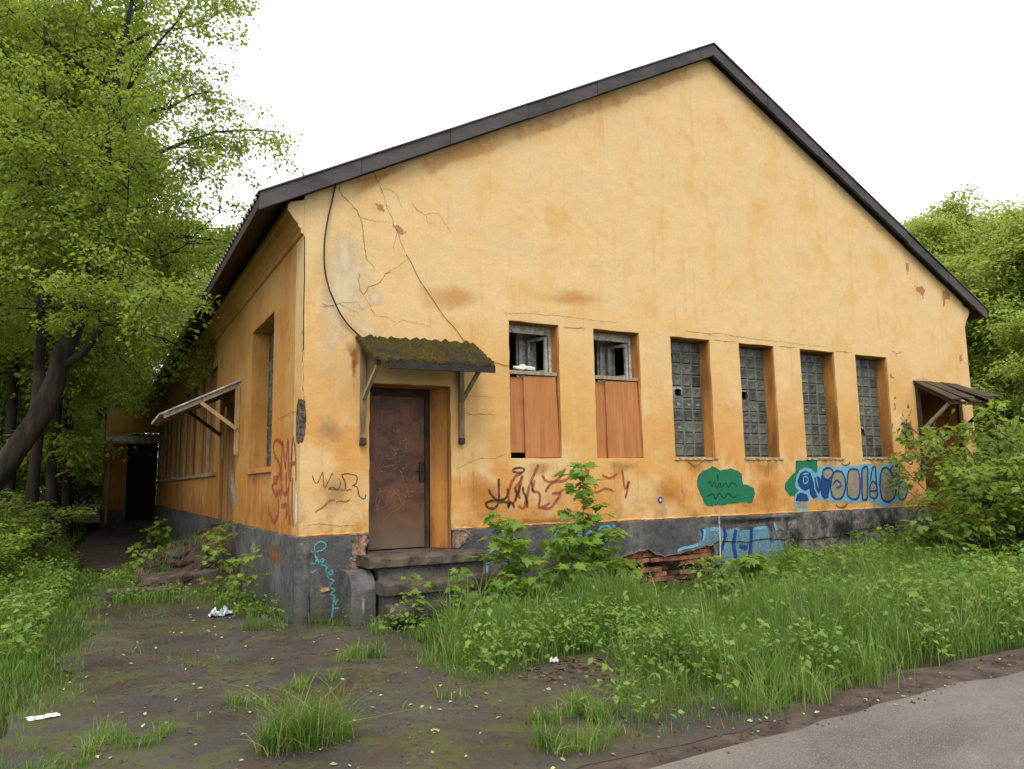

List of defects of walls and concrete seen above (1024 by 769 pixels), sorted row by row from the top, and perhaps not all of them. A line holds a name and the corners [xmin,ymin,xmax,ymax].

crack [321,183,451,326]
spalling [614,543,716,587]